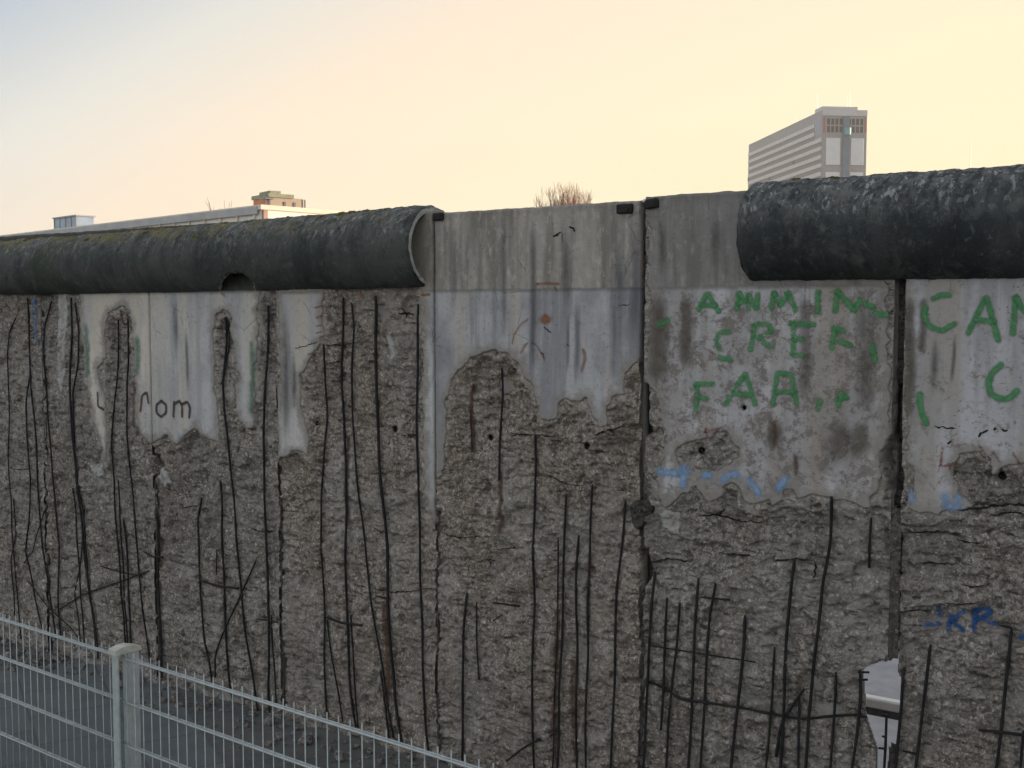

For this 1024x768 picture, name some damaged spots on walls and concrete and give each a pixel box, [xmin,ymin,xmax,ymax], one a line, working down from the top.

corrosion [497,471,505,531]
spalling [0,211,1024,768]
crack [899,503,1024,613]